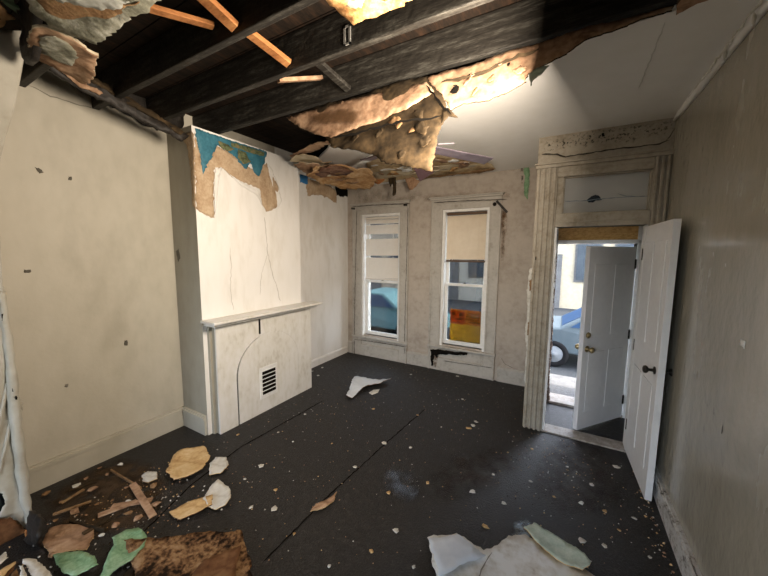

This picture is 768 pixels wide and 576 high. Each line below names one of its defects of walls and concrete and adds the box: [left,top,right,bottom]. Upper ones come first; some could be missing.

flaking render [0,0,162,45]
flaking render [676,0,708,15]
peeling [184,128,282,218]
peeling [300,174,348,203]
peeling [366,150,496,190]